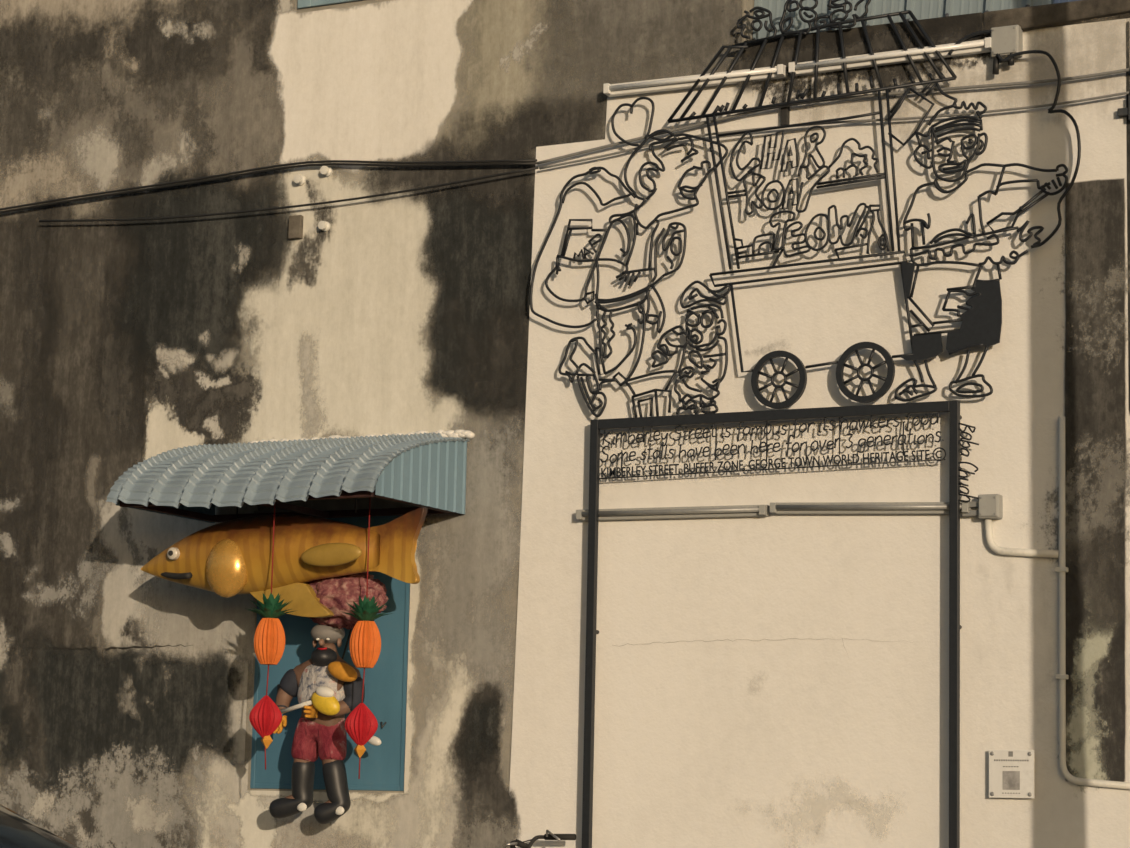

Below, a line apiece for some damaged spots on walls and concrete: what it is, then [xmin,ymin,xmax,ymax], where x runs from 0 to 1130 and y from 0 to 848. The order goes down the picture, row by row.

leakage [0,0,289,848]